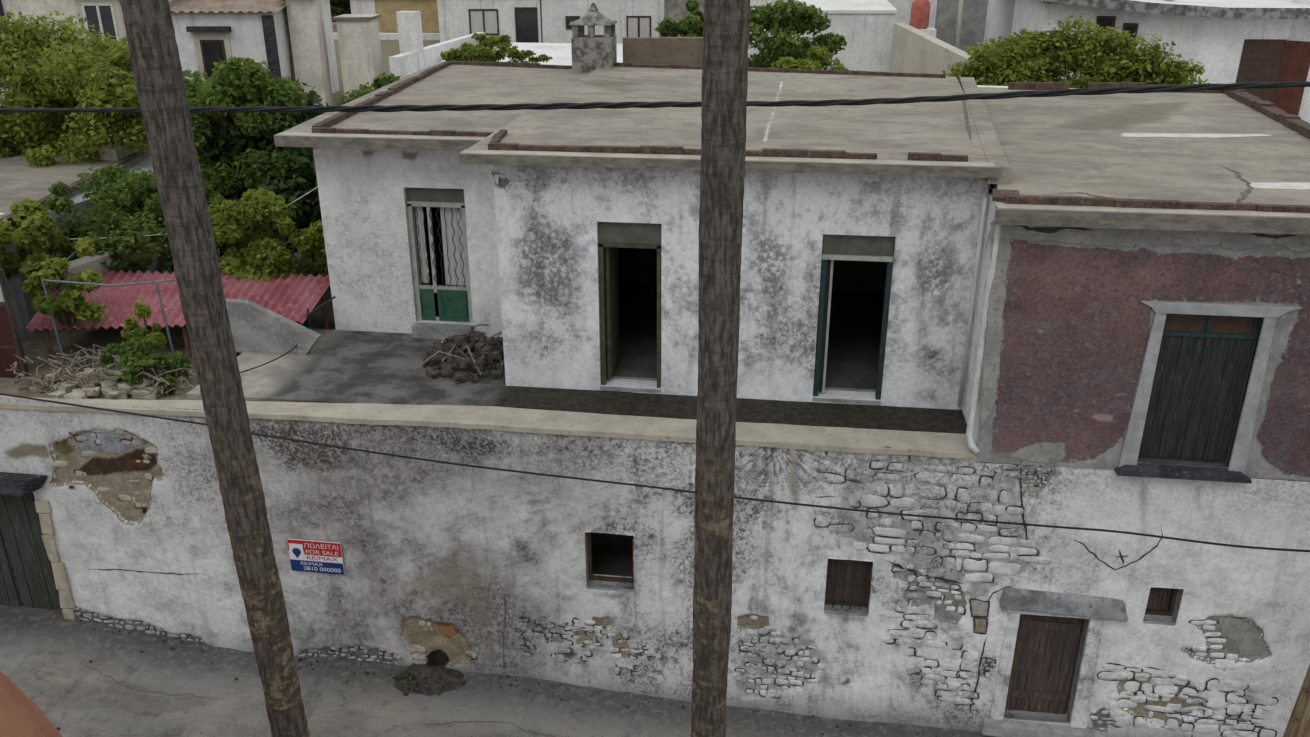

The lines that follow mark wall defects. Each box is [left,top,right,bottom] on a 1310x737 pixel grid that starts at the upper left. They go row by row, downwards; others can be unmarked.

crack [1219,164,1254,203]
crack [1014,225,1094,233]
crack [1252,232,1297,240]
spalling [48,429,164,525]
flaking render [827,442,1066,634]
crack [1075,525,1163,571]
spalling [299,617,477,666]
spalling [514,614,662,677]
flaking render [734,614,825,699]
spalling [1181,615,1272,671]
flaking render [1090,677,1265,737]